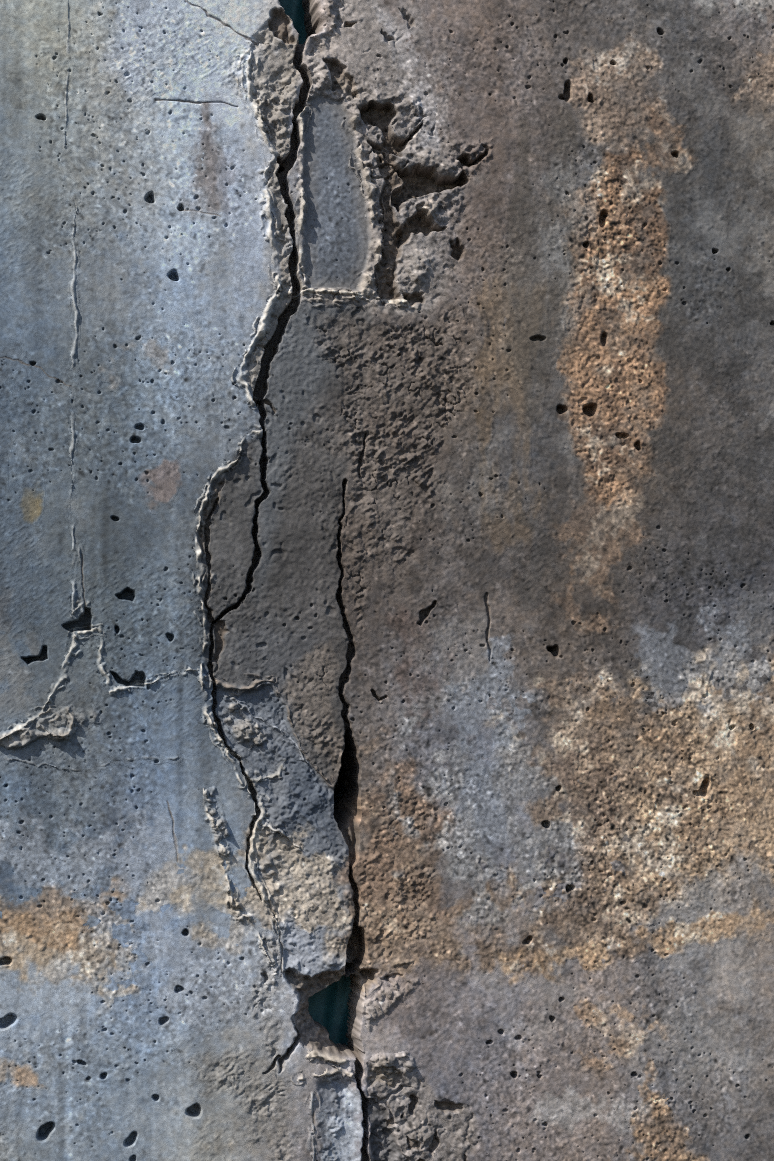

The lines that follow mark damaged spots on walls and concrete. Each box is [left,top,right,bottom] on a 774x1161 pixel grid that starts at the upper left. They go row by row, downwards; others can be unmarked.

crack [155,99,239,108]
crack [0,356,74,410]
crack [204,38,313,746]
corrosion [467,32,699,636]
spalling [173,0,494,1161]
crack [417,600,438,626]
crack [333,434,388,977]
crack [245,786,279,925]
corrosion [352,624,774,988]
corrosion [0,877,141,1015]
crack [263,1055,282,1075]
crack [353,1049,371,1161]